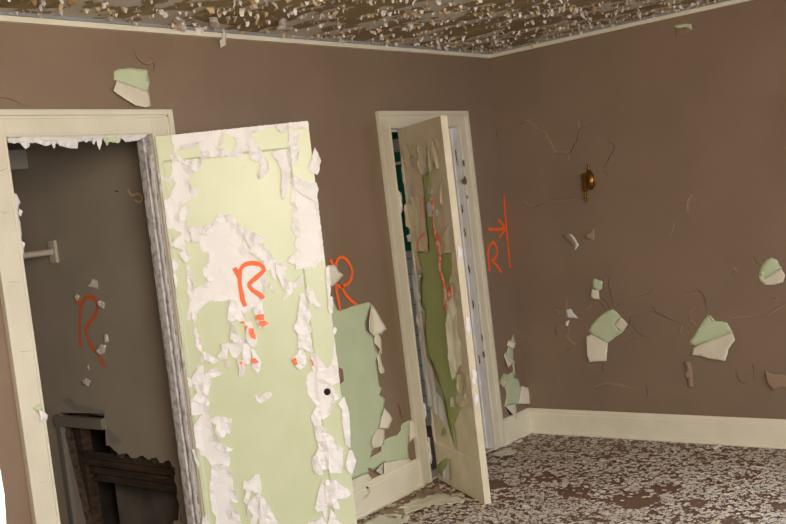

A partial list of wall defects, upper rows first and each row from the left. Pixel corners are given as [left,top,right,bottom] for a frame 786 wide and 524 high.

peeling [0,0,720,54]
peeling [114,68,151,107]
peeling [161,121,415,524]
peeling [398,138,485,451]
peeling [499,333,531,418]
peeling [586,309,628,362]
crack [600,276,707,343]
peeling [684,315,735,388]
peeling [759,258,785,285]
hole [72,427,182,524]